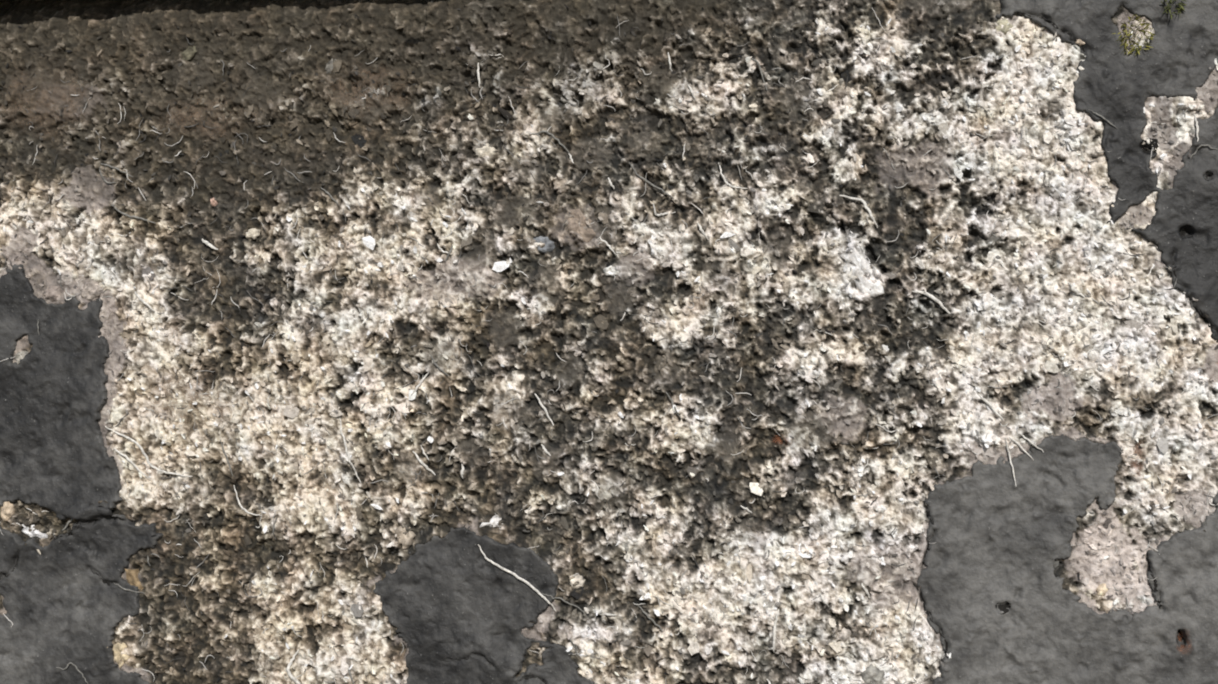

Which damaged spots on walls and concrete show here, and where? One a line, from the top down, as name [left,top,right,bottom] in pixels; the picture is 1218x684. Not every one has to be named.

spalling [1111,5,1154,56]
spalling [1140,58,1218,190]
spalling [0,319,39,364]
spalling [0,500,80,555]